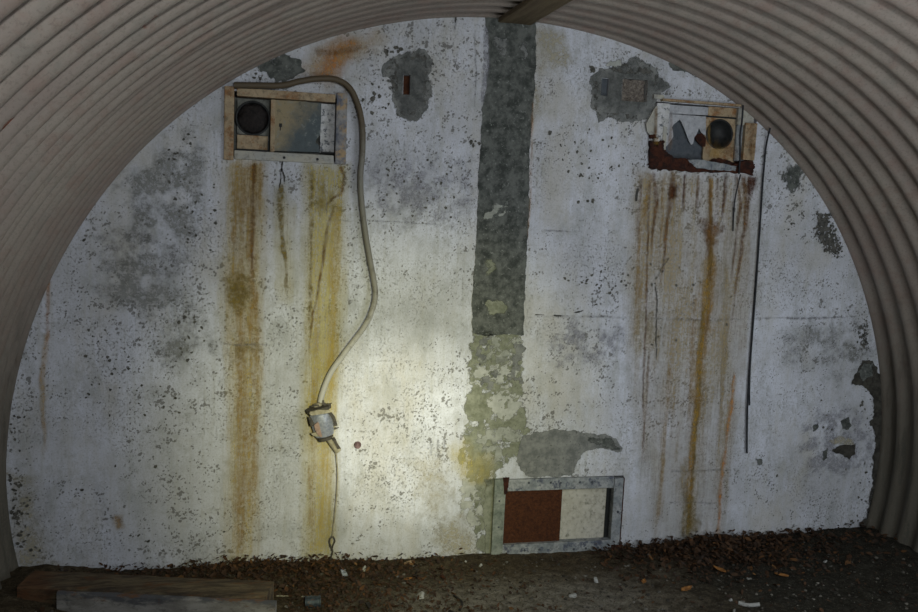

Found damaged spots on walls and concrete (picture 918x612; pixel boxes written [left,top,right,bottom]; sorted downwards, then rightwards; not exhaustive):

spalling [250,54,305,90]
spalling [359,46,434,122]
spalling [587,56,671,135]
rust [648,112,669,164]
rust [709,149,736,165]
peeling [781,165,845,259]
peeling [458,17,622,553]
rust [227,252,258,534]
rust [307,166,345,553]
rust [635,173,756,535]
spalling [813,411,856,470]
spalling [843,311,882,528]